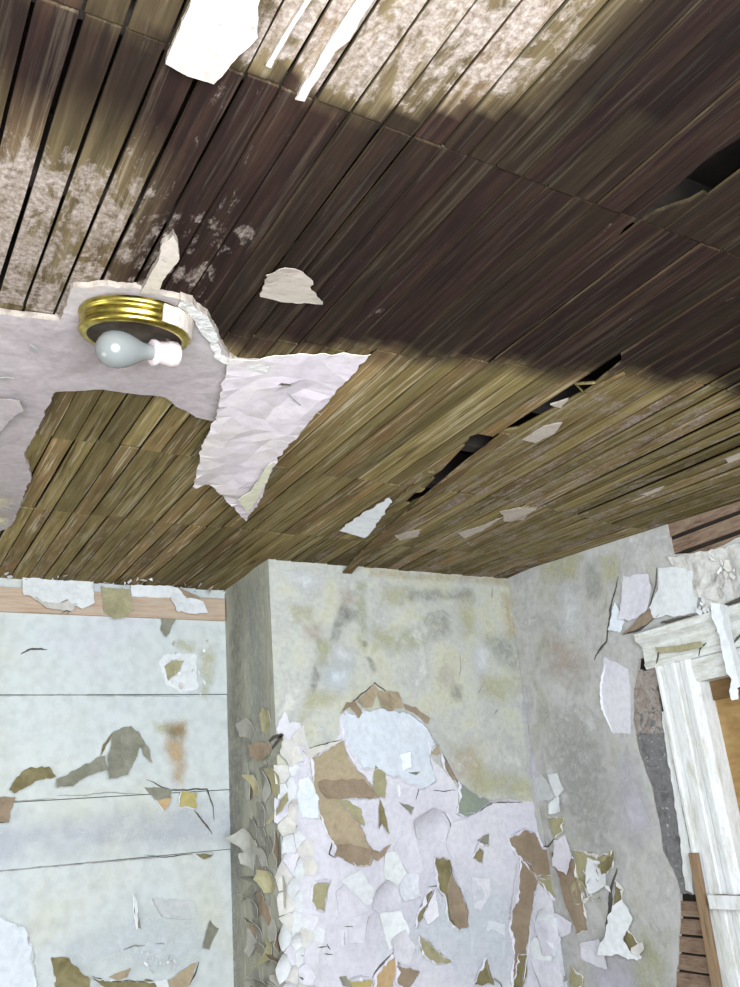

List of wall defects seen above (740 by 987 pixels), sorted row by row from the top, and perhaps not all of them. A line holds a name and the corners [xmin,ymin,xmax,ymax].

peeling [193,352,371,521]
peeling [4,572,227,695]
crack [15,792,136,802]
peeling [0,726,152,823]
peeling [145,779,214,833]
peeling [225,588,644,987]
flaking render [594,501,740,987]
peeling [0,916,39,987]
peeling [51,957,199,987]
peeling [132,892,141,930]
peeling [202,920,219,950]